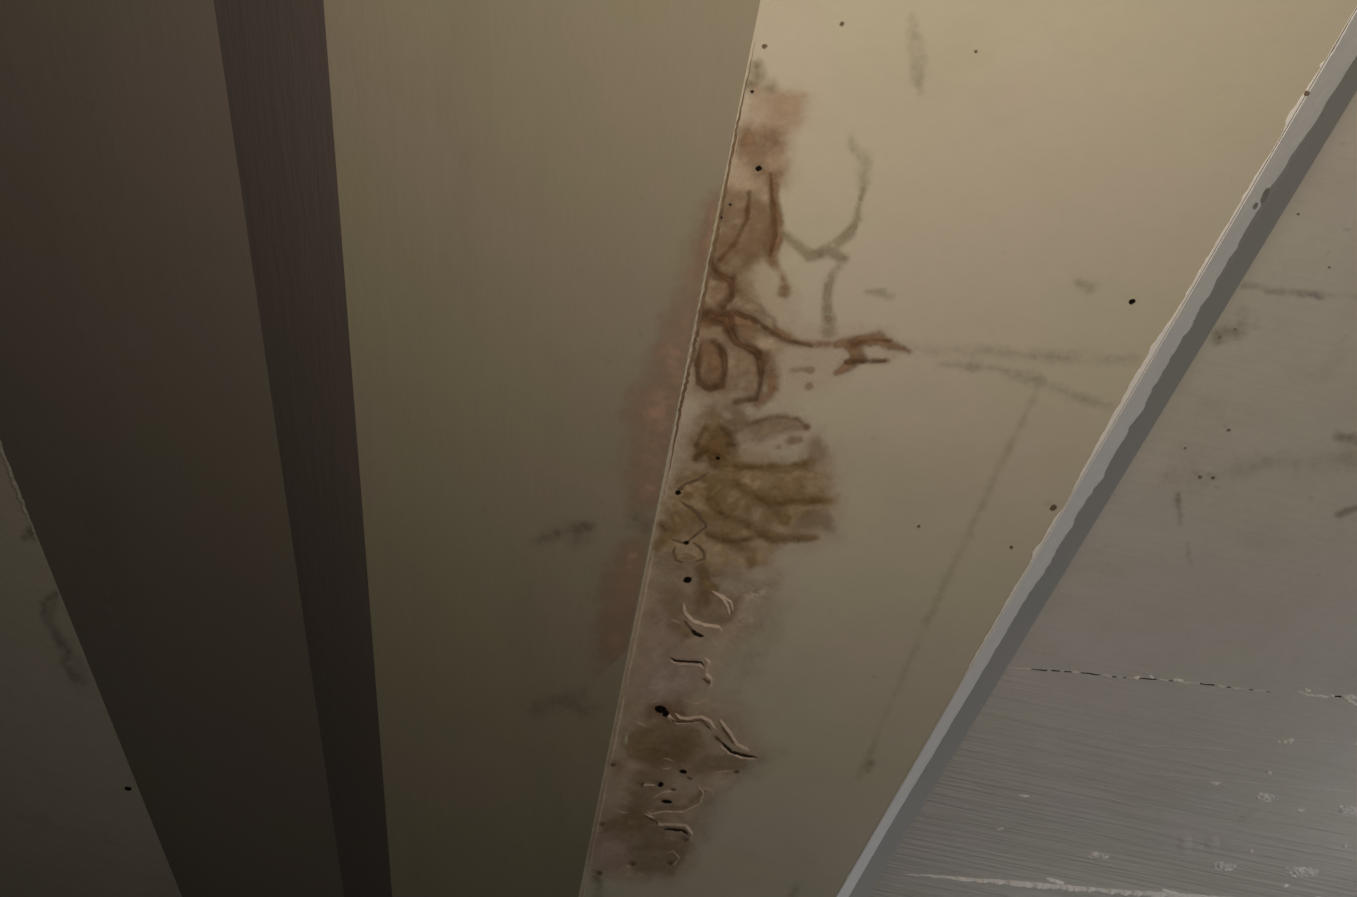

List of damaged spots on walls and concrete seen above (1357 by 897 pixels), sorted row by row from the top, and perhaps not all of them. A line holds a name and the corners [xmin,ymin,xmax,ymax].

leakage [654,410,835,593]
peeling [594,557,772,879]